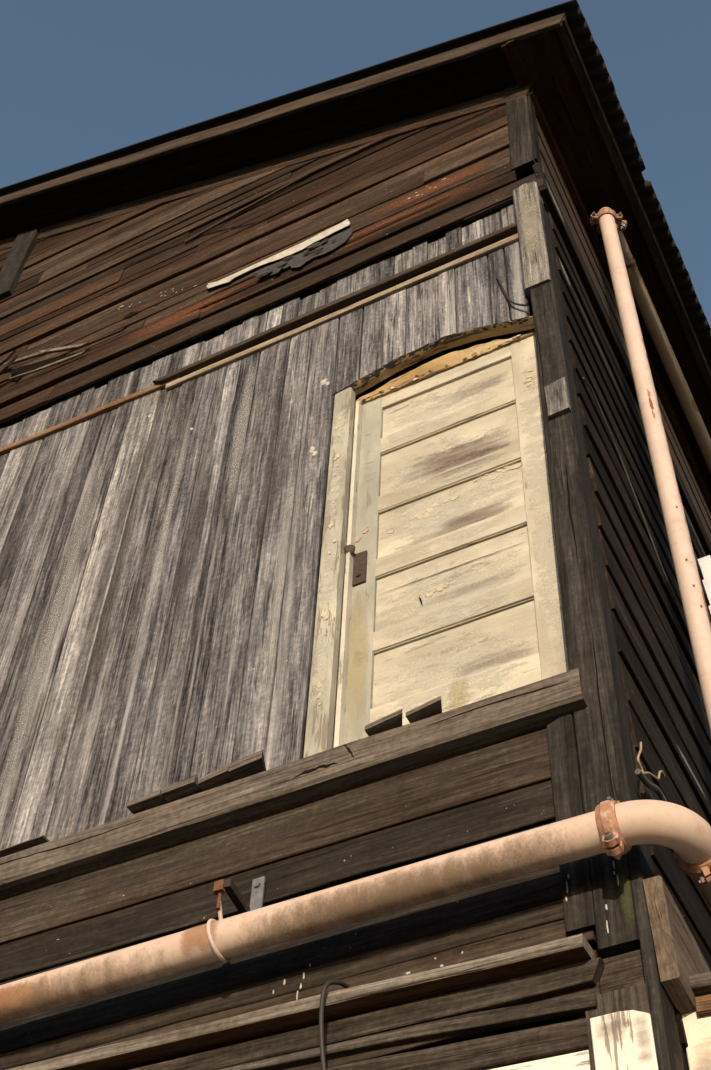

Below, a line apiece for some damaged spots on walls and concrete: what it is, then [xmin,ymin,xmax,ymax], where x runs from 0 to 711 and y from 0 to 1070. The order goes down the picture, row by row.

peeling [207,219,352,289]